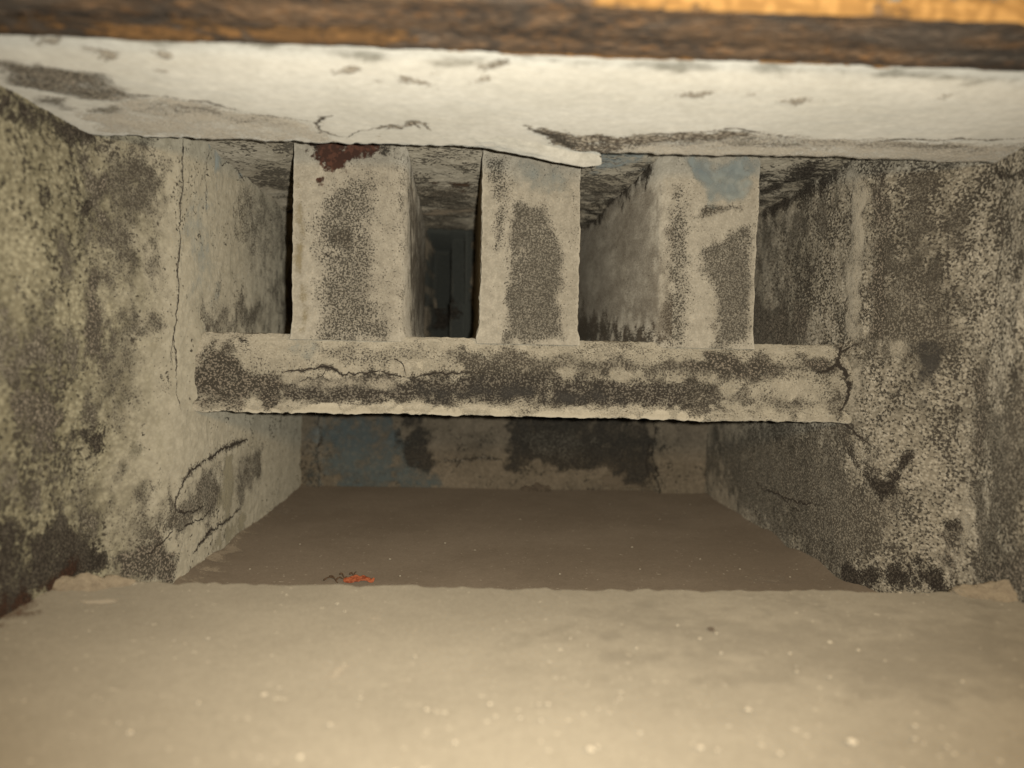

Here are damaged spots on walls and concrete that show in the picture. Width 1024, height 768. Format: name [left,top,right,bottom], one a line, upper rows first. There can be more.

crack [138,95,431,138]
crack [171,143,244,404]
water stain [0,59,262,619]
crack [282,358,500,382]
water stain [193,148,1024,597]
crack [816,339,872,447]
crack [146,436,248,555]